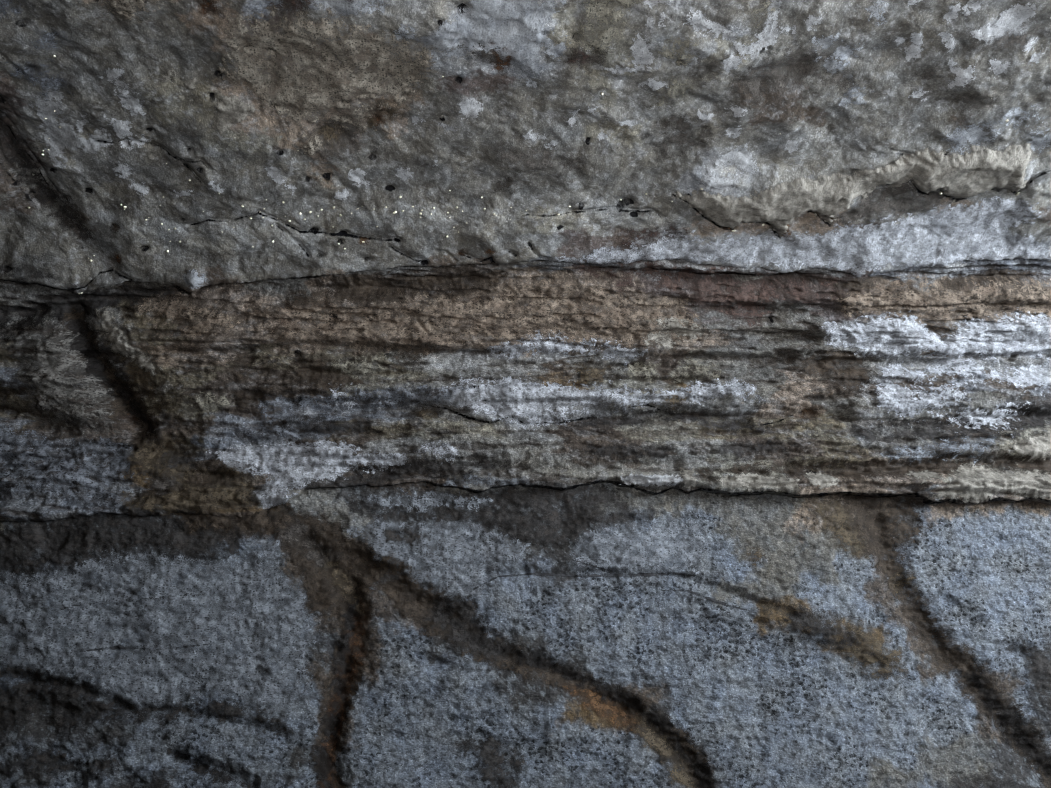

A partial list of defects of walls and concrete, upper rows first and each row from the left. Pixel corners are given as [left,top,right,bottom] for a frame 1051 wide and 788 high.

crack [913,183,963,202]
crack [991,170,1050,195]
crack [67,269,133,291]
crack [435,479,1051,504]
water stain [0,307,1051,788]